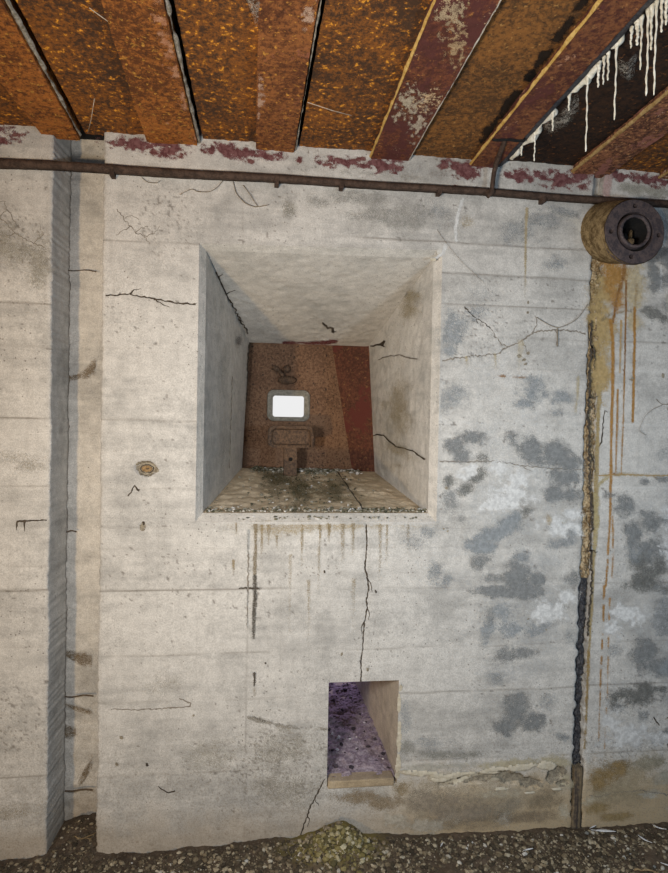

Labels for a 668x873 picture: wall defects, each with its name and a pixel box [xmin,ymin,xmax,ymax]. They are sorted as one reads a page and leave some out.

efflorescence [570,64,602,94]
peeling [94,134,405,180]
peeling [436,158,485,186]
efflorescence [510,108,558,160]
peeling [500,166,593,192]
damp [492,202,586,296]
crack [106,288,197,307]
crack [370,307,668,636]
rust [575,261,665,822]
crack [338,472,372,682]
spalling [375,685,579,802]
crack [300,779,325,835]